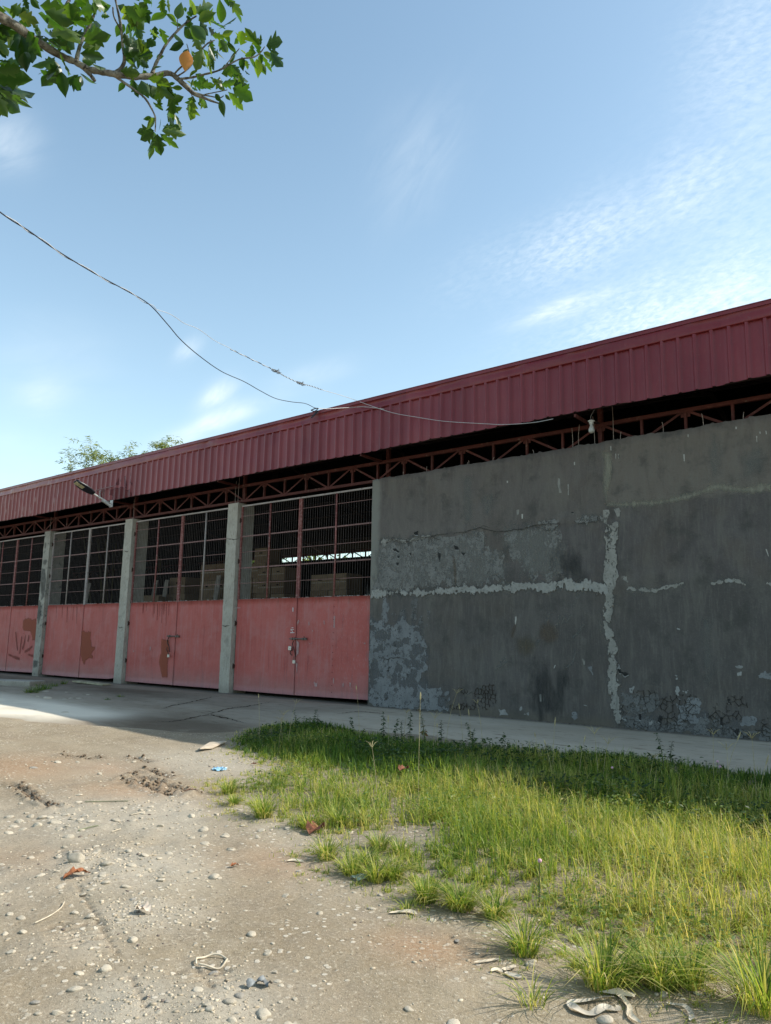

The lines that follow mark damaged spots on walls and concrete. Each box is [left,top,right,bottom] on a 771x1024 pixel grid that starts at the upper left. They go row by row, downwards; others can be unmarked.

corrosion [9,618,36,660]
corrosion [80,631,95,664]
corrosion [159,639,169,677]
peeling [368,508,771,741]